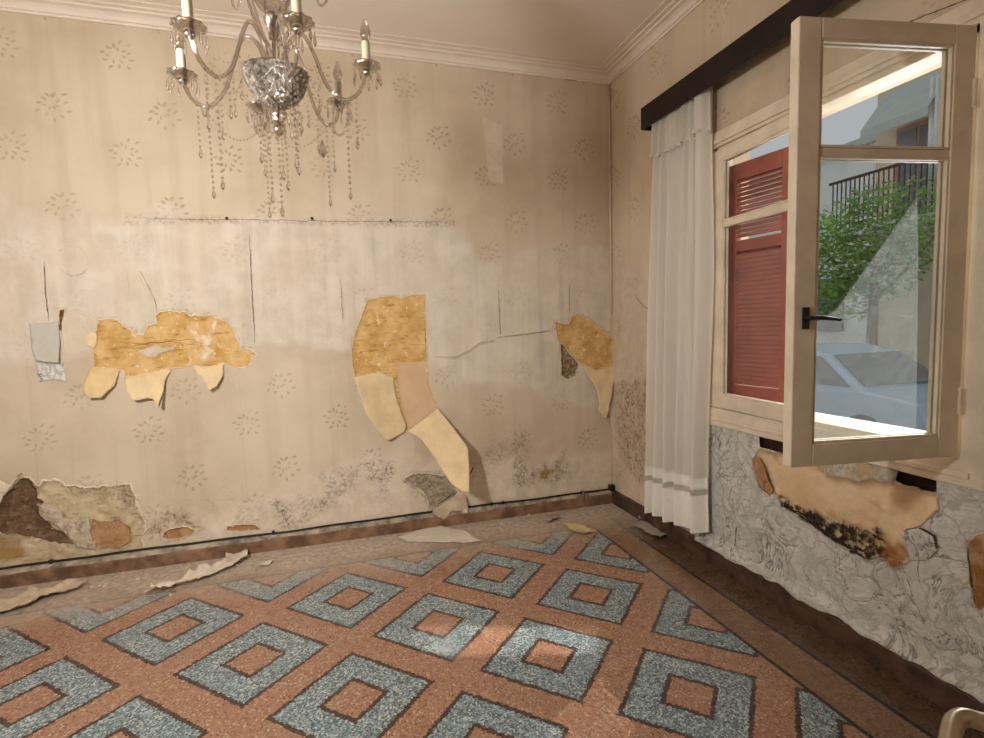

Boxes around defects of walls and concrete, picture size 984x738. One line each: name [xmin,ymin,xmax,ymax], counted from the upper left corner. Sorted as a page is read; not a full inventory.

crack [43,265,51,321]
crack [249,236,257,342]
damp [0,189,649,433]
spalling [561,344,578,379]
spalling [0,472,147,568]
damp [152,441,643,547]
spalling [403,472,468,520]
spalling [751,448,940,568]